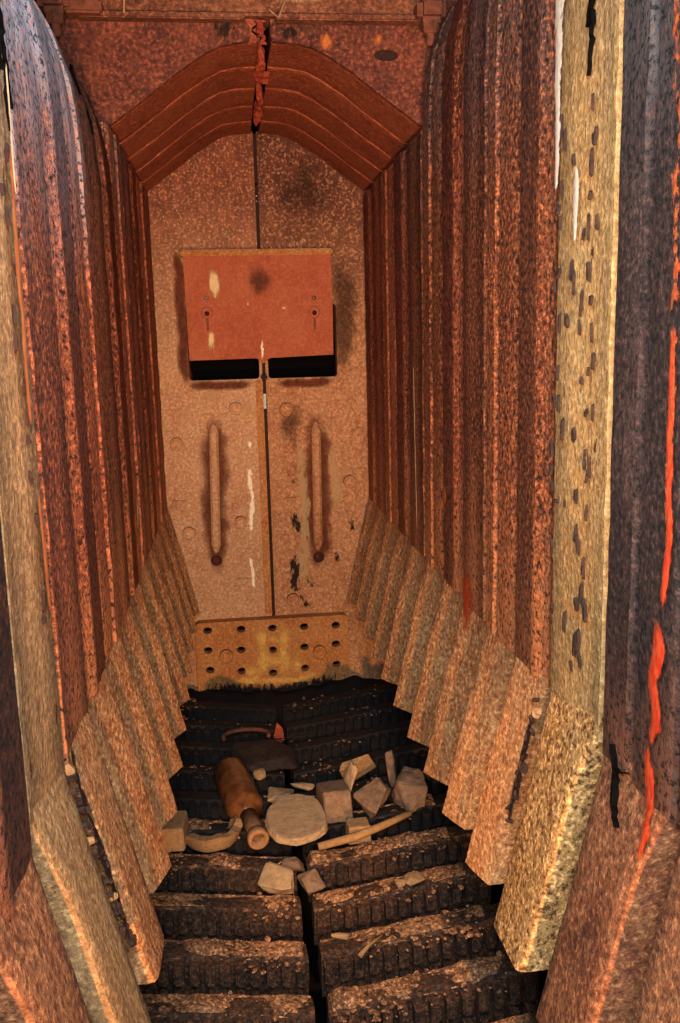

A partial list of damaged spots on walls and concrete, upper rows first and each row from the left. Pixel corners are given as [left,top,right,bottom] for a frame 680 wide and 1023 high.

crack [0,0,14,131]
crack [251,25,269,129]
crack [585,0,596,76]